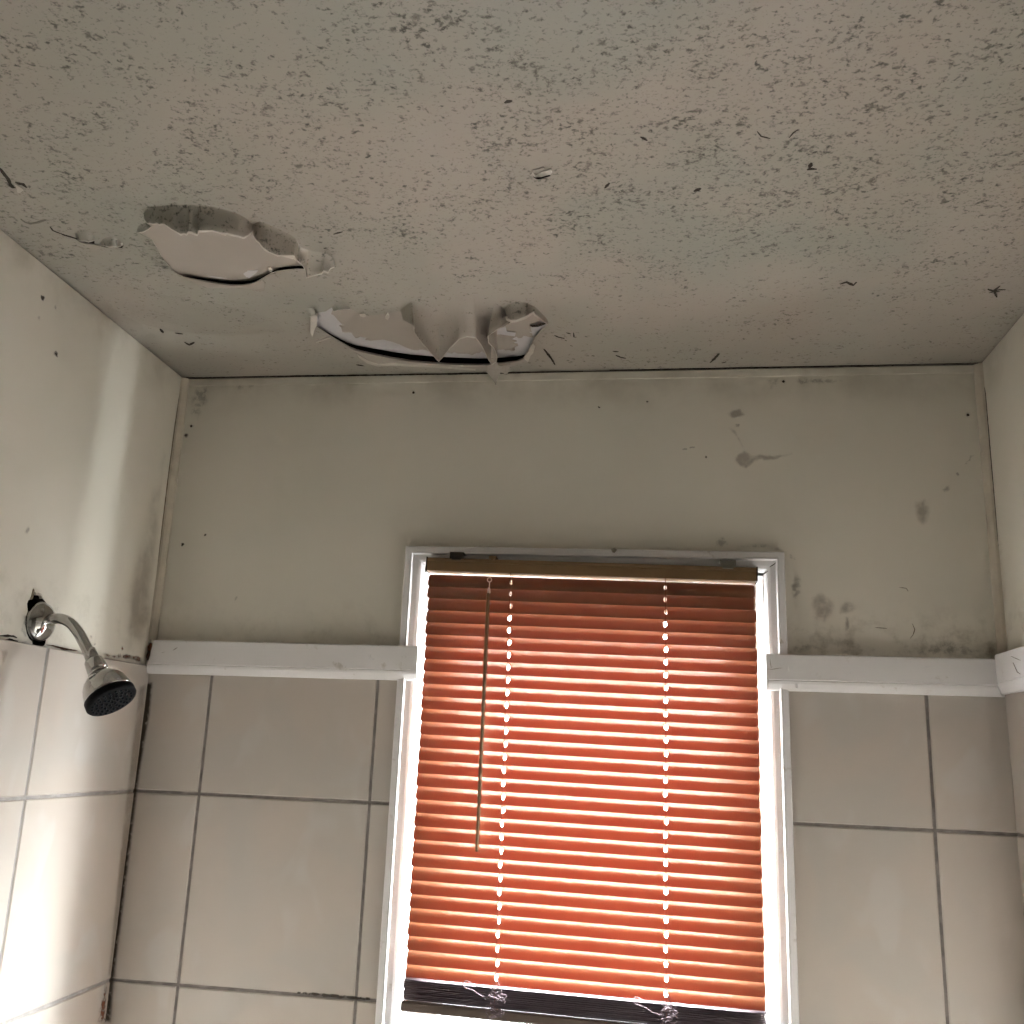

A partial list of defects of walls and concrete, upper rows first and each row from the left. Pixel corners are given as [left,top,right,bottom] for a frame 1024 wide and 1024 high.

peeling [137,204,335,291]
peeling [306,294,549,385]